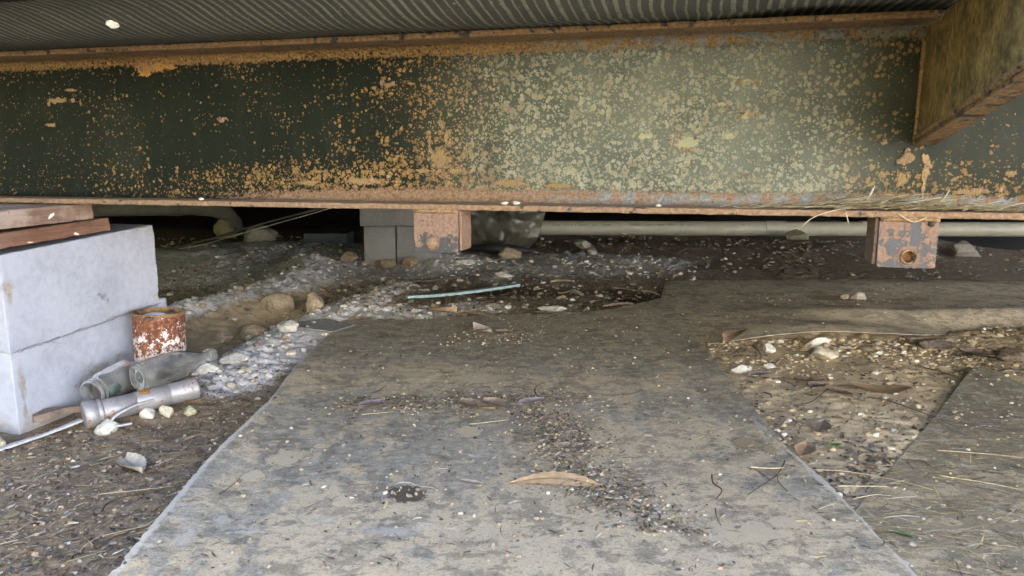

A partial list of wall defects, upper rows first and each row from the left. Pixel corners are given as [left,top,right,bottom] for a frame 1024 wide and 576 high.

rust [131,61,178,77]
rust [884,148,933,202]
rust [949,171,1018,197]